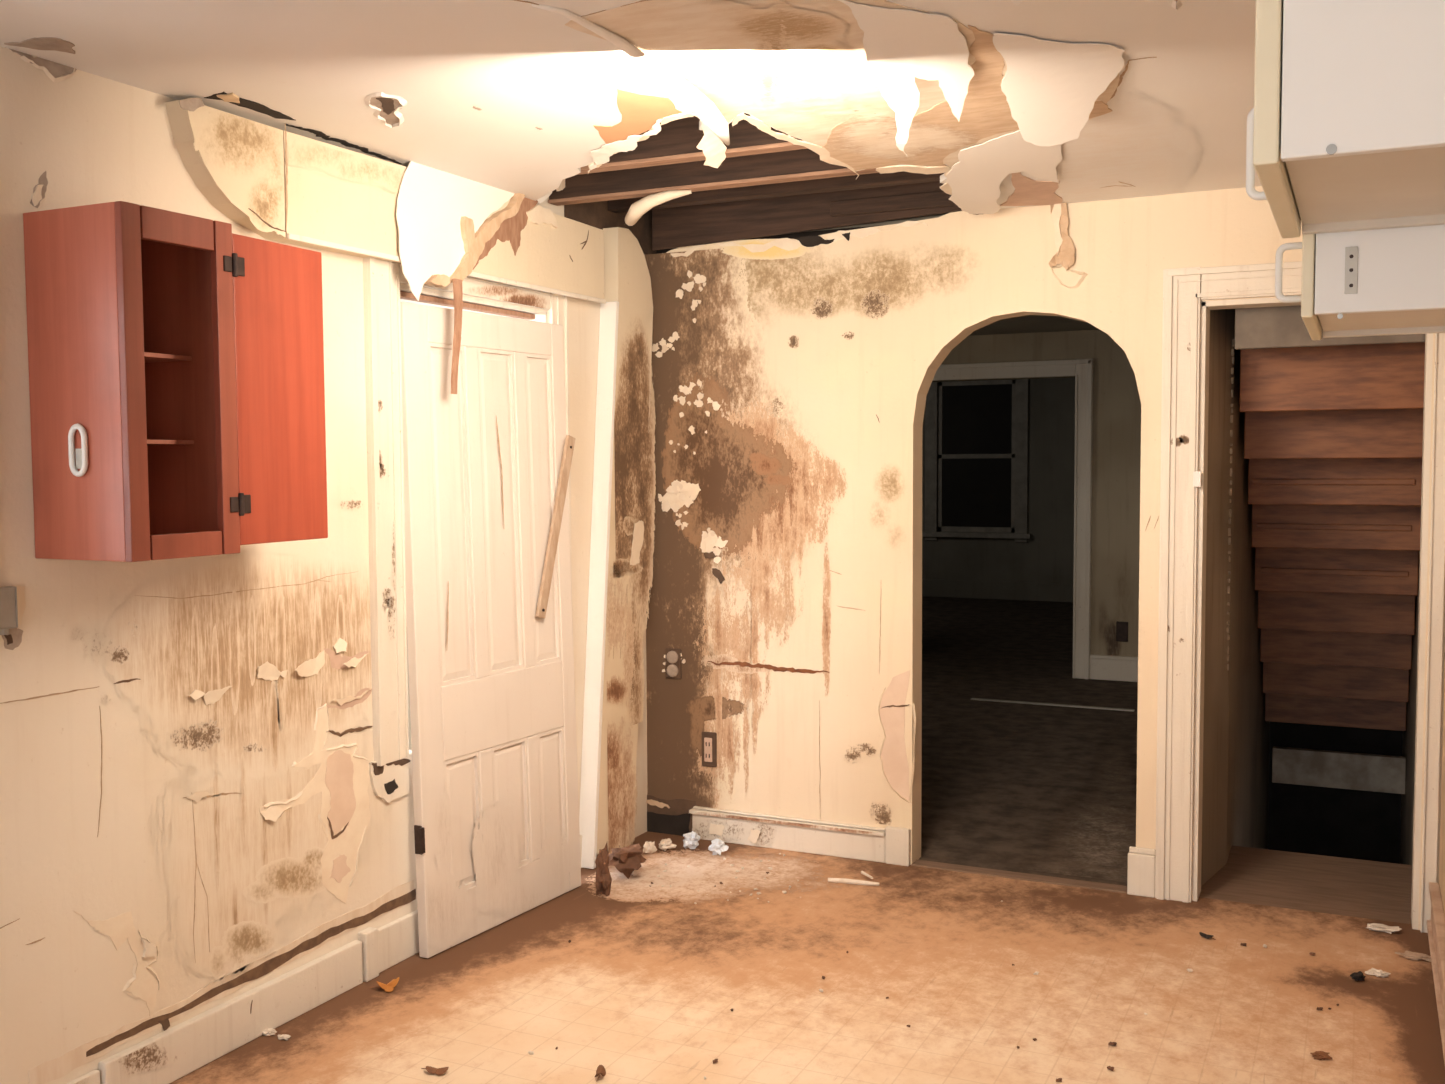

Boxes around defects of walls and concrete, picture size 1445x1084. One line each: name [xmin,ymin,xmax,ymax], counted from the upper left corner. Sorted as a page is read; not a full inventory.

flaking render [4,37,77,82]
water stain [193,110,405,235]
peeling [179,92,928,394]
peeling [532,0,1124,289]
water stain [707,0,978,161]
water stain [613,238,986,846]
crack [0,678,141,837]
water stain [70,522,396,986]
peeling [257,638,369,681]
crack [701,654,830,794]
flaking render [29,686,416,1084]